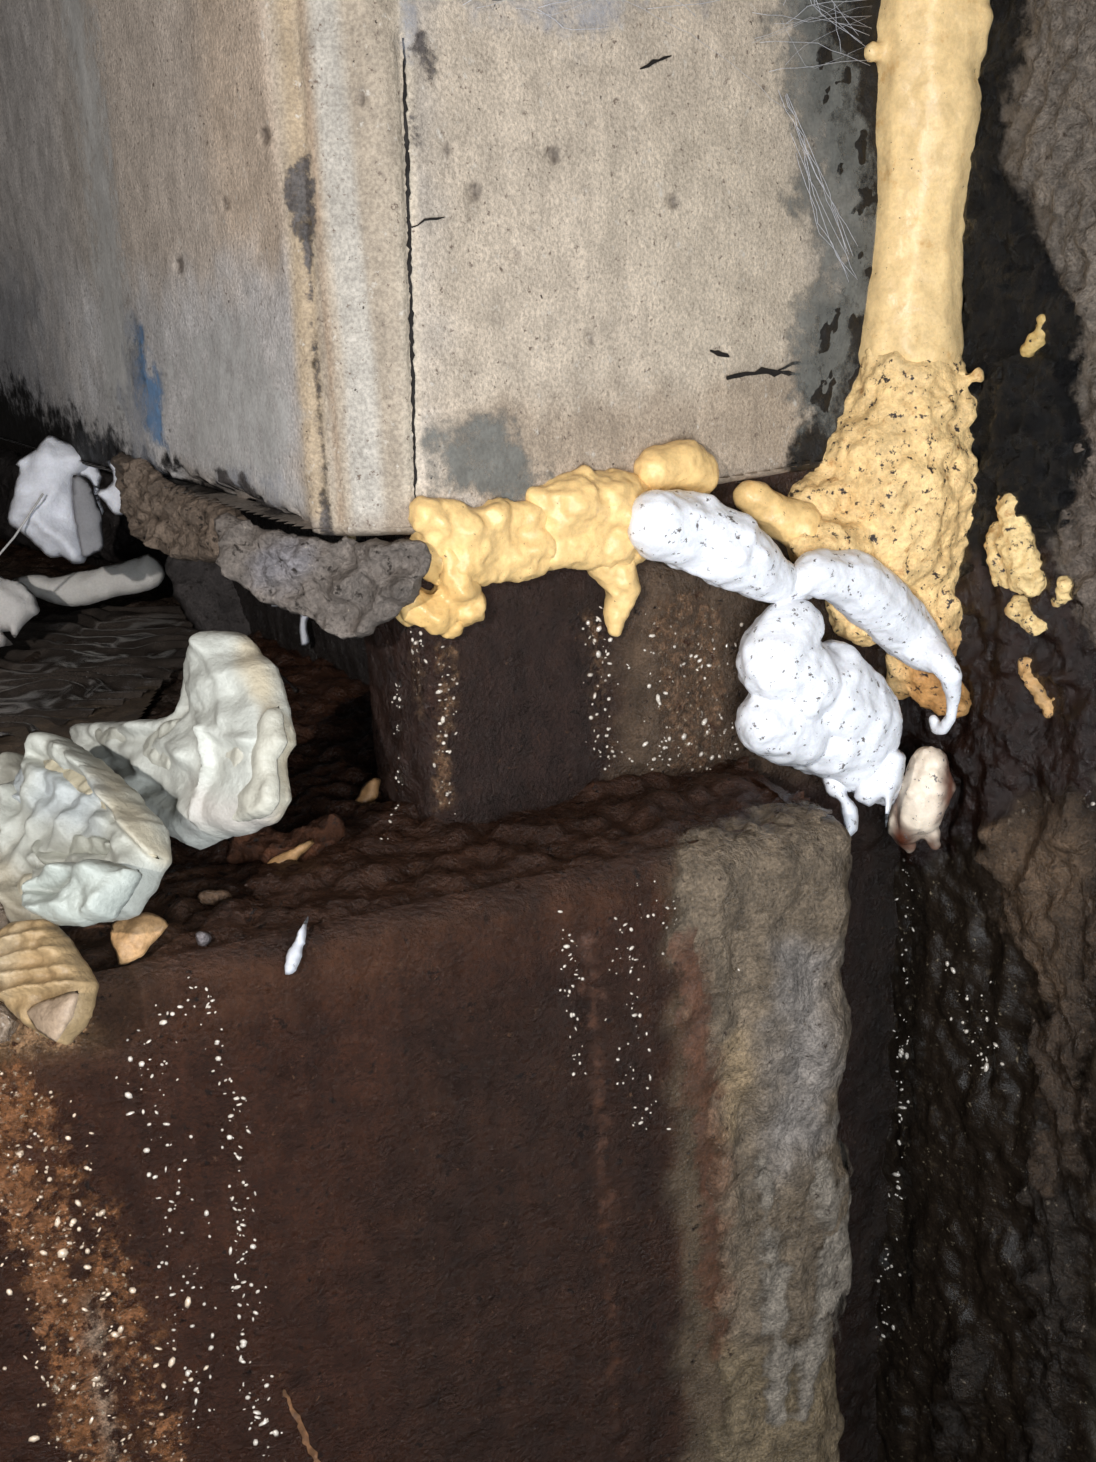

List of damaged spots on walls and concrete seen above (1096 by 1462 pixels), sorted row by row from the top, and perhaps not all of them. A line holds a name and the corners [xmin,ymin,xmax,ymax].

crack [402,38,444,498]
water stain [874,645,887,680]
water stain [896,0,1096,867]
water stain [0,1019,87,1056]